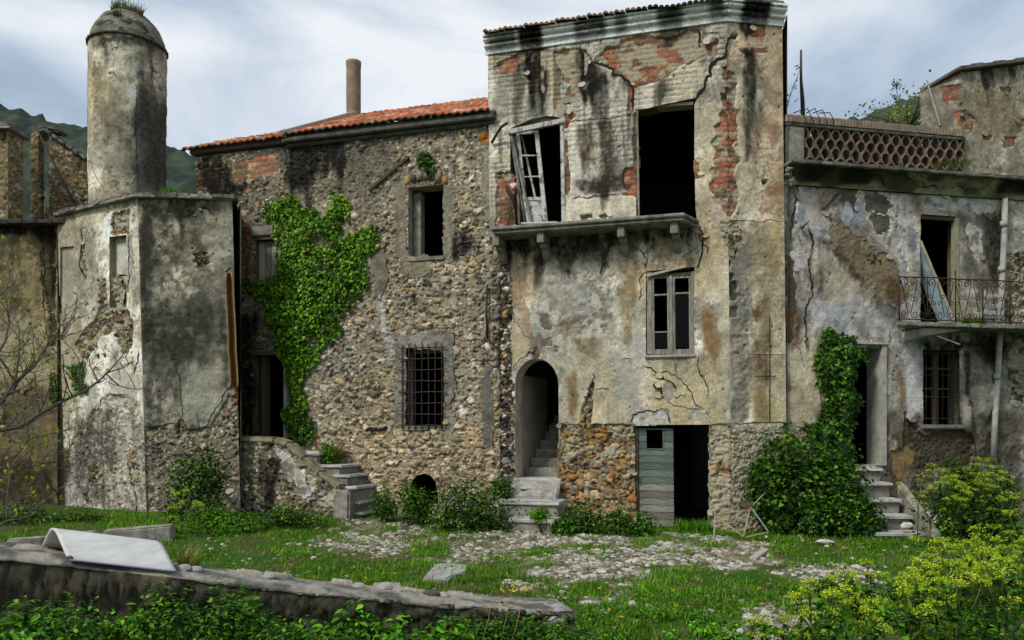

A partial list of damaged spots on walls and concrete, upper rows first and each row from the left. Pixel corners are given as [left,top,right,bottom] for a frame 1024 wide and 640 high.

flaking render [76,274,134,362]
flaking render [110,210,130,238]
leakage [92,34,167,185]
leakage [491,26,547,117]
leakage [575,17,605,35]
leakage [576,48,629,203]
crack [573,54,635,121]
flaking render [493,29,743,317]
crack [732,186,814,368]
flaking render [821,189,911,308]
crack [149,368,232,474]
crack [565,355,786,425]